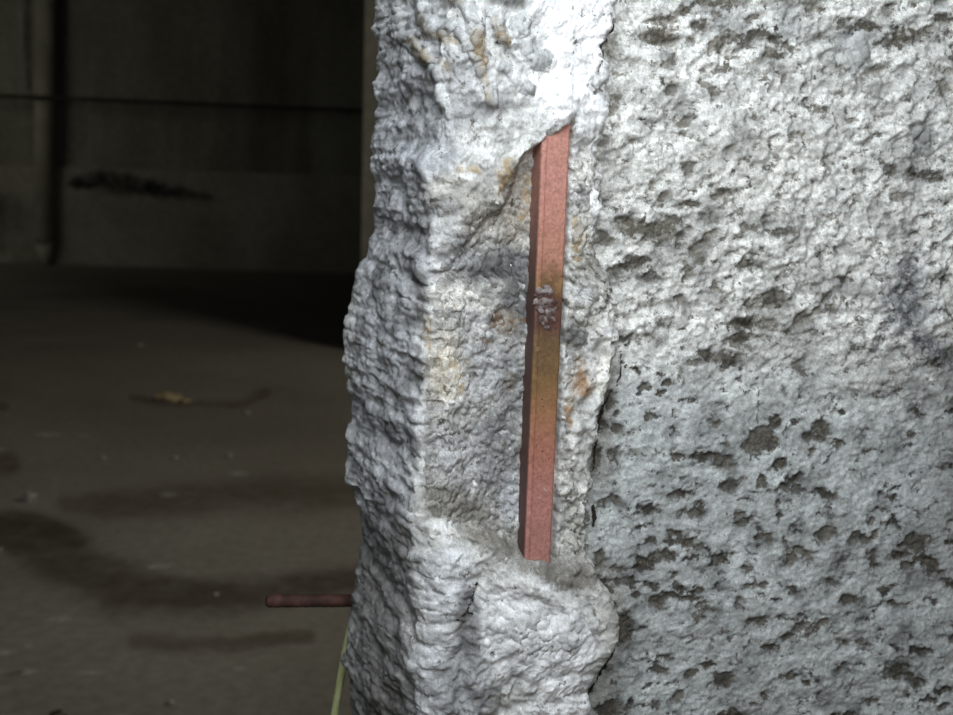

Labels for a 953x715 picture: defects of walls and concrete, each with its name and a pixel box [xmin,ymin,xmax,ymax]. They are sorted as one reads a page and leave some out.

spalling [422,158,534,541]
rust [491,265,560,329]
spalling [558,157,614,560]
crack [591,345,622,472]
crack [590,504,598,527]
crack [588,649,615,695]